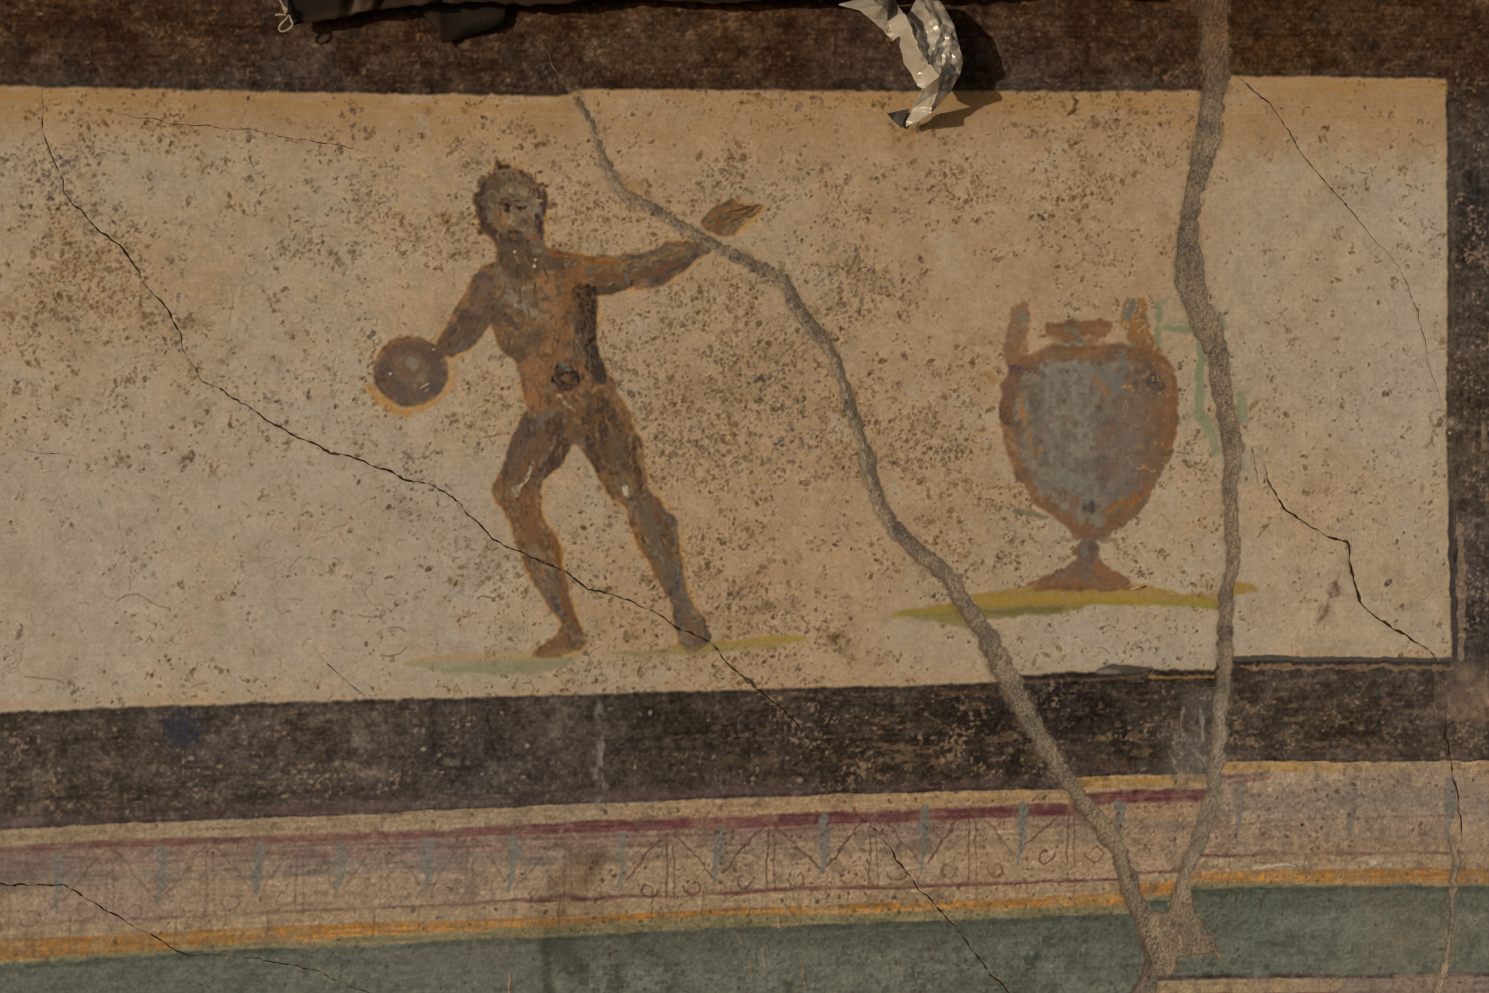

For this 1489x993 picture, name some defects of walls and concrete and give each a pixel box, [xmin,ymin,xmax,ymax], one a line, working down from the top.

crack [546,0,1434,993]
crack [0,883,209,956]
crack [246,957,369,993]
crack [1434,692,1462,993]